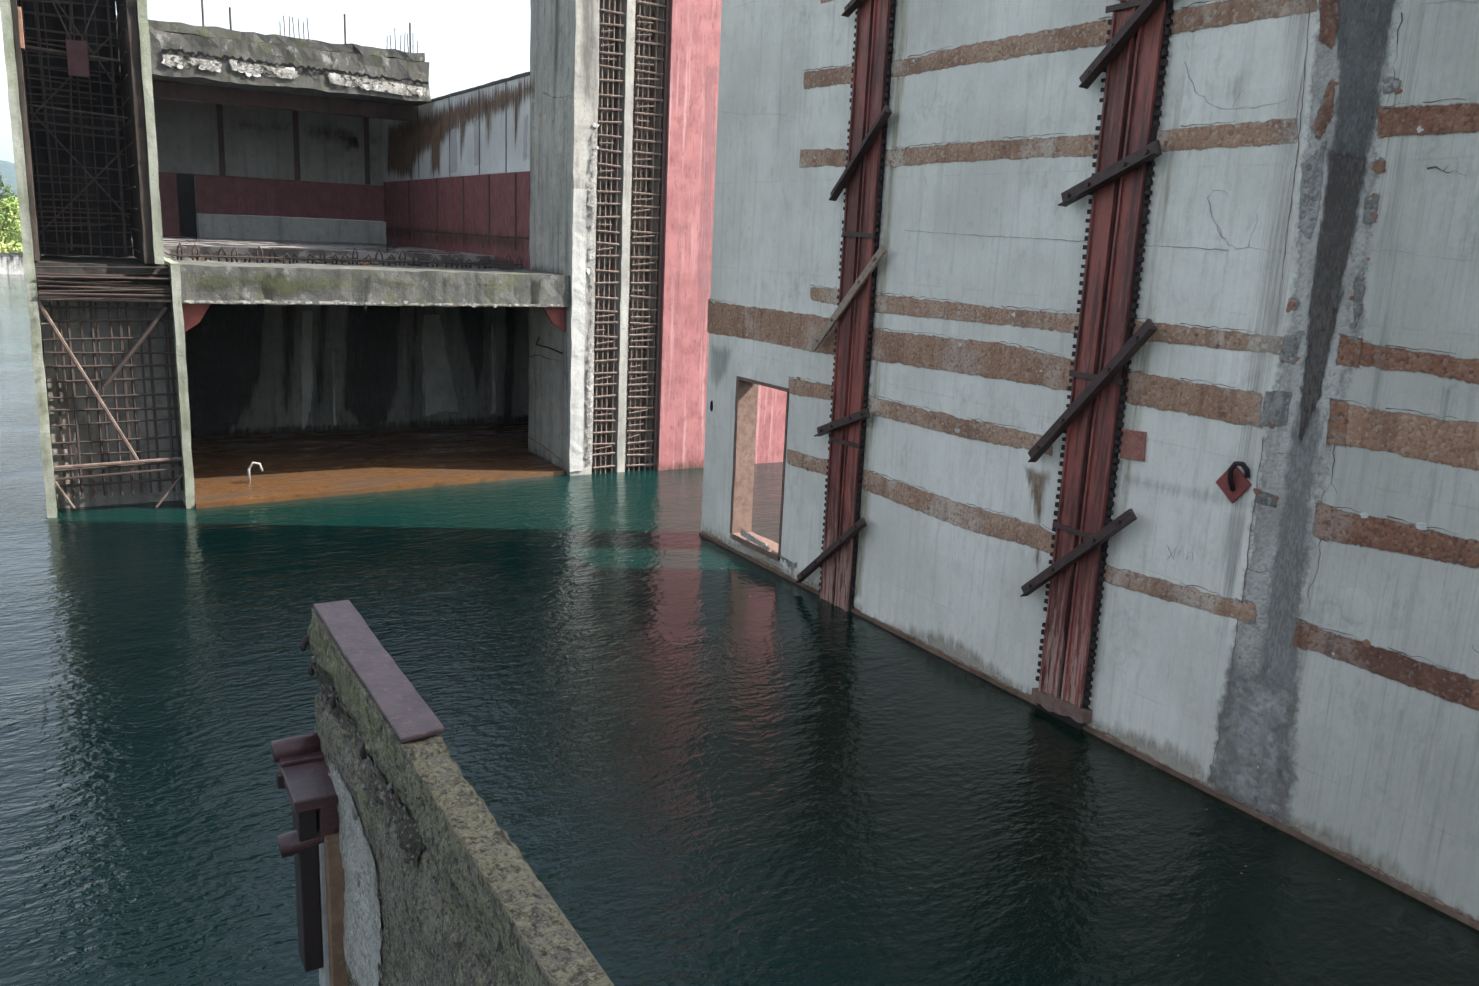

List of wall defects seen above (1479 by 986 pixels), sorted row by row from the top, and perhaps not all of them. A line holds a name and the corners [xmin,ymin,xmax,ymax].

spalling [161,54,299,79]
spalling [891,17,1111,77]
rust [387,78,534,180]
crack [1144,0,1311,333]
crack [905,230,1087,243]
water stain [185,274,529,437]
water stain [531,280,541,306]
spalling [707,284,839,355]
spalling [871,292,1080,391]
spalling [1125,369,1292,429]
water stain [1253,0,1394,776]
rust [1028,471,1045,517]